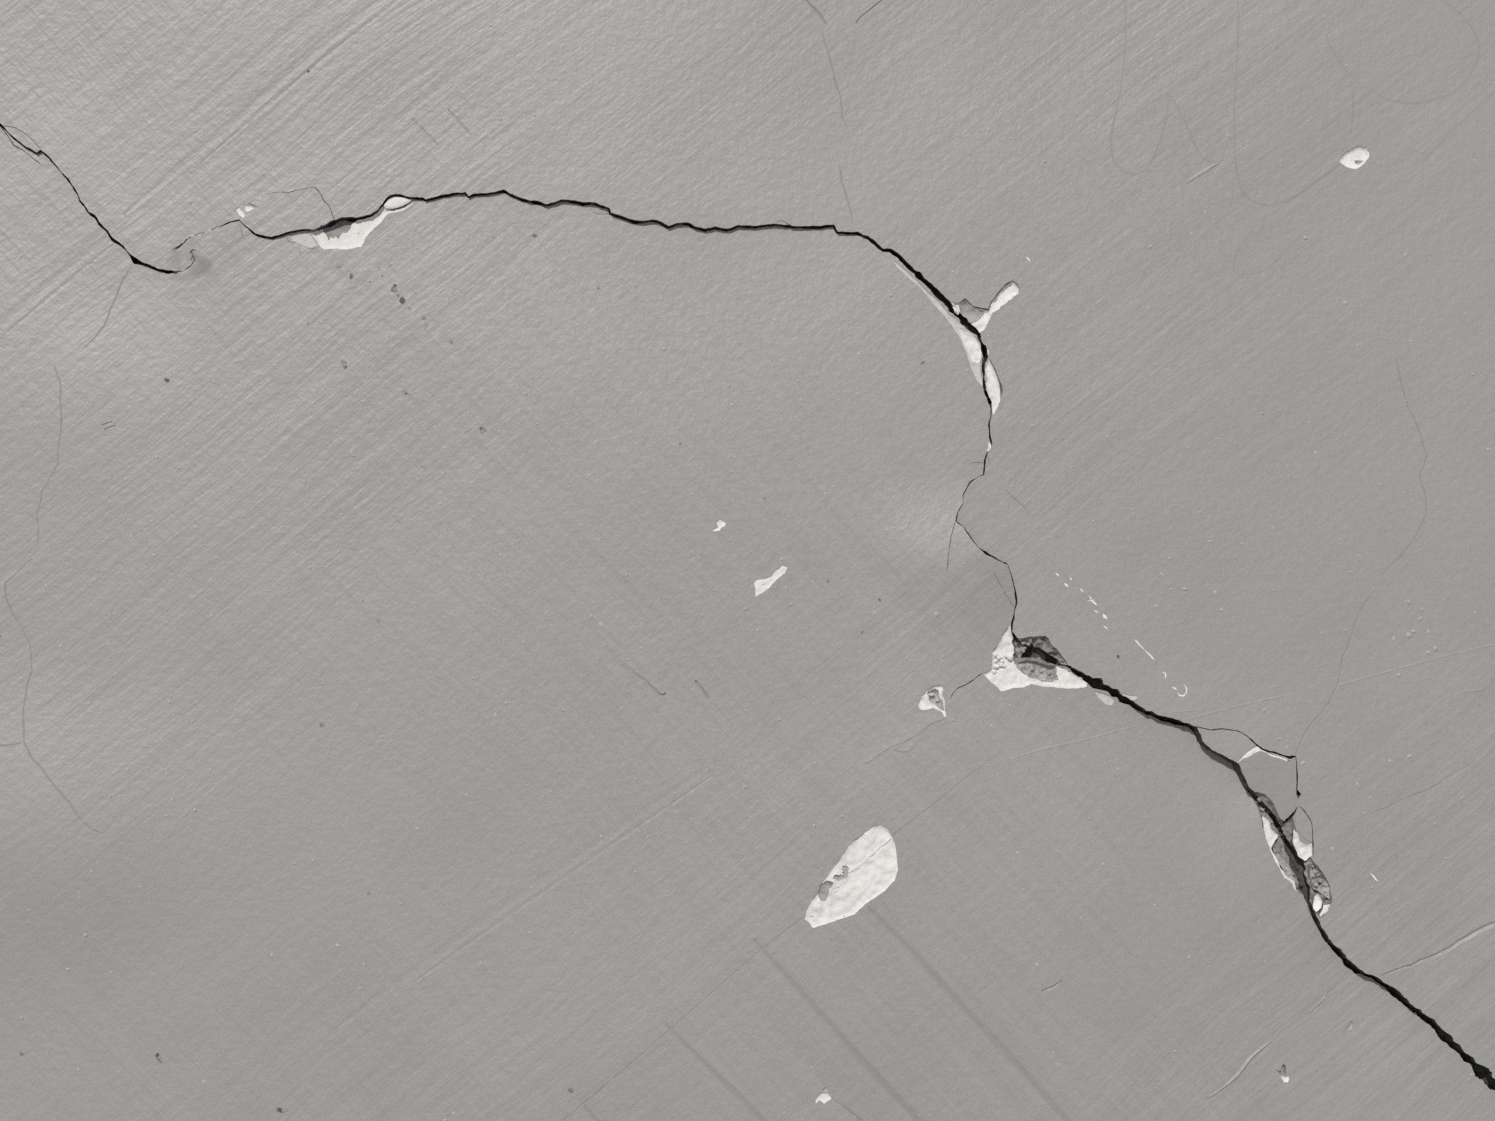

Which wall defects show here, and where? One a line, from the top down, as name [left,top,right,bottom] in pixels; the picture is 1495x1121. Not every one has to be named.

crack [822,29,847,127]
flaking render [290,197,415,249]
flaking render [894,261,1019,414]
crack [0,123,1030,834]
flaking render [984,624,1087,691]
crack [1056,358,1495,1090]
peeling [805,825,898,928]
flaking render [1253,792,1332,919]